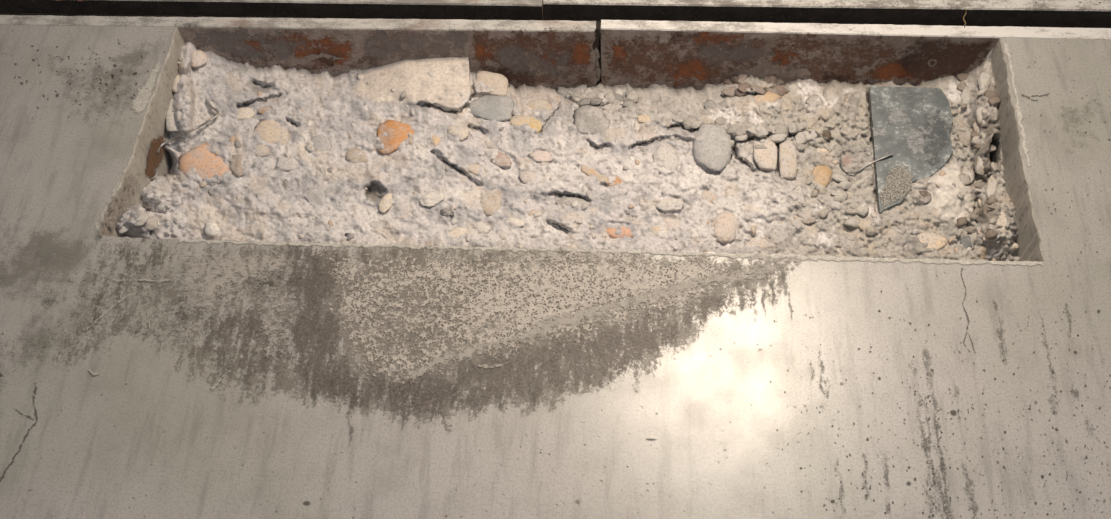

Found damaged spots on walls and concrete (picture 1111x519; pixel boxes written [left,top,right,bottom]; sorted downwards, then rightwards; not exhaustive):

rust [231,31,377,71]
crack [565,29,623,106]
rust [469,27,991,88]
spalling [95,42,1044,266]
damp [53,238,792,443]
crack [961,268,975,353]
crack [0,384,38,481]